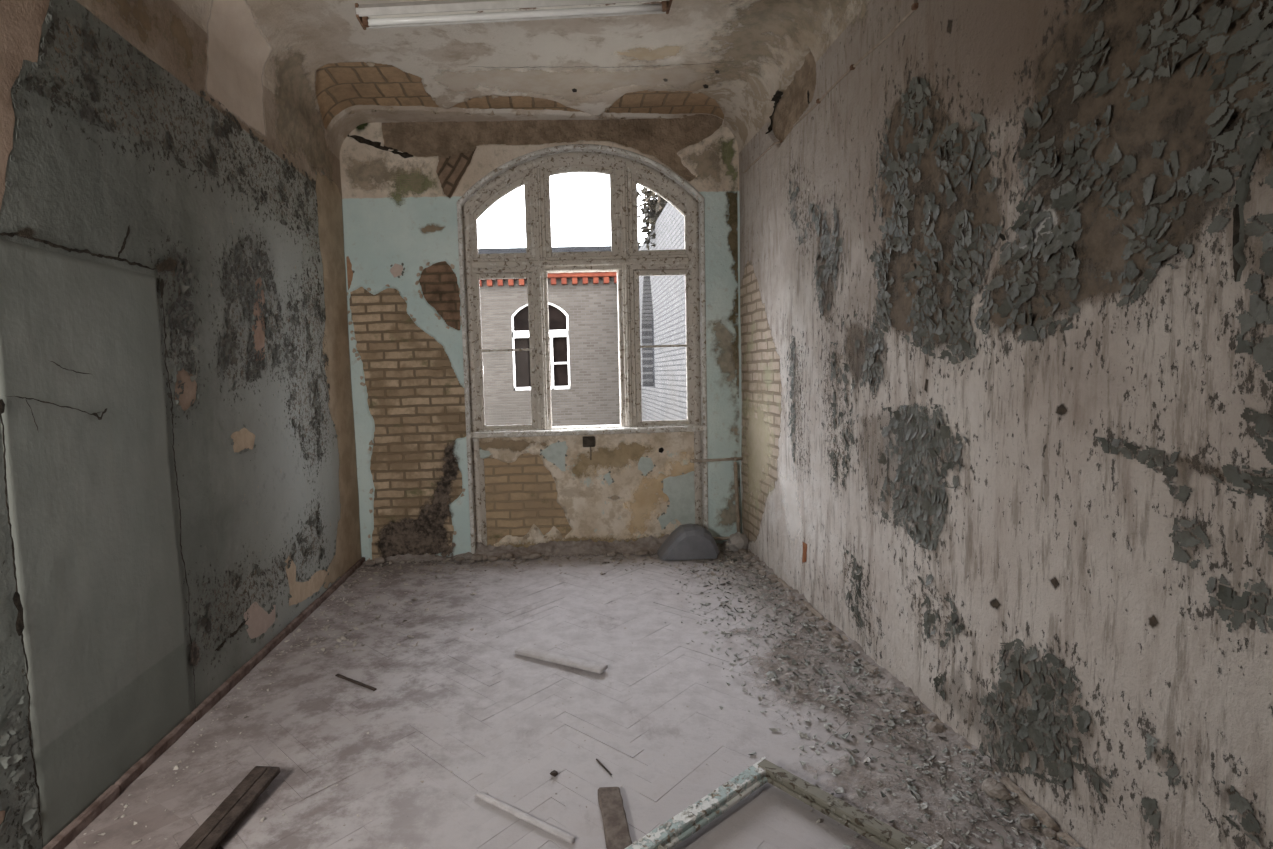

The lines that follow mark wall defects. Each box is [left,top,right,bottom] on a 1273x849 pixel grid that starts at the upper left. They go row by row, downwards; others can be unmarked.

flaking render [315,62,727,198]
flaking render [766,49,816,142]
peeling [789,0,1273,557]
crack [0,225,247,708]
flaking render [479,441,572,546]
flaking render [740,260,806,543]
crack [0,396,107,848]
peeling [843,550,876,637]
peeling [910,574,964,647]
peeling [1205,574,1273,634]
peeling [0,696,39,849]
peeling [933,638,1113,798]